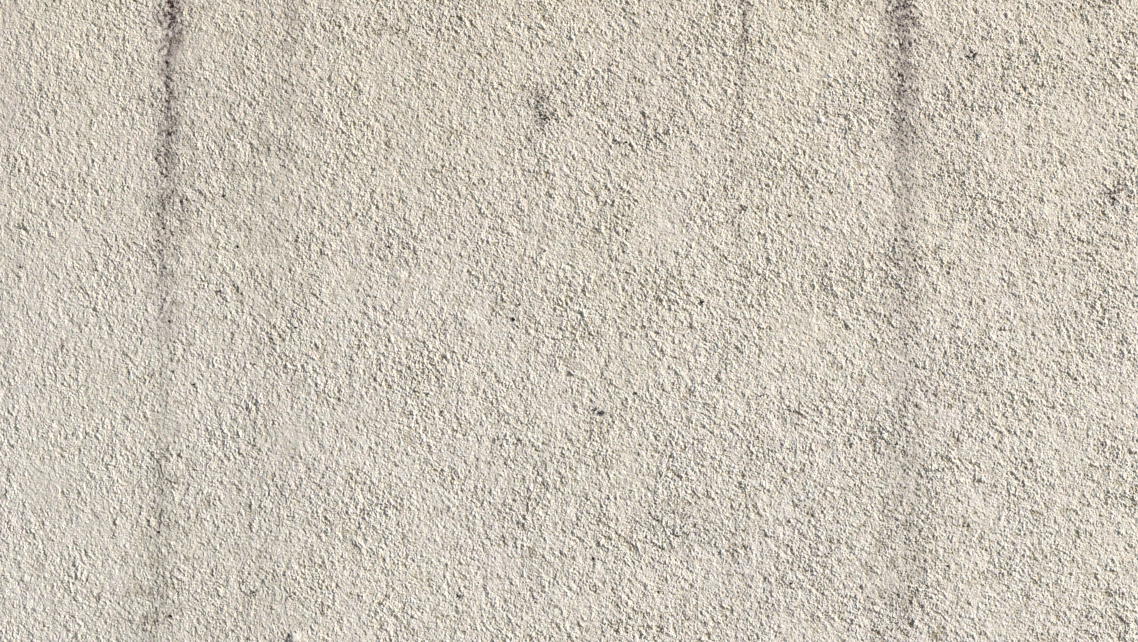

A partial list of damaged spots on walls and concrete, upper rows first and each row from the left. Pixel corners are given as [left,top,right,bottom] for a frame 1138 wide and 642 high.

damp [151,0,180,251]